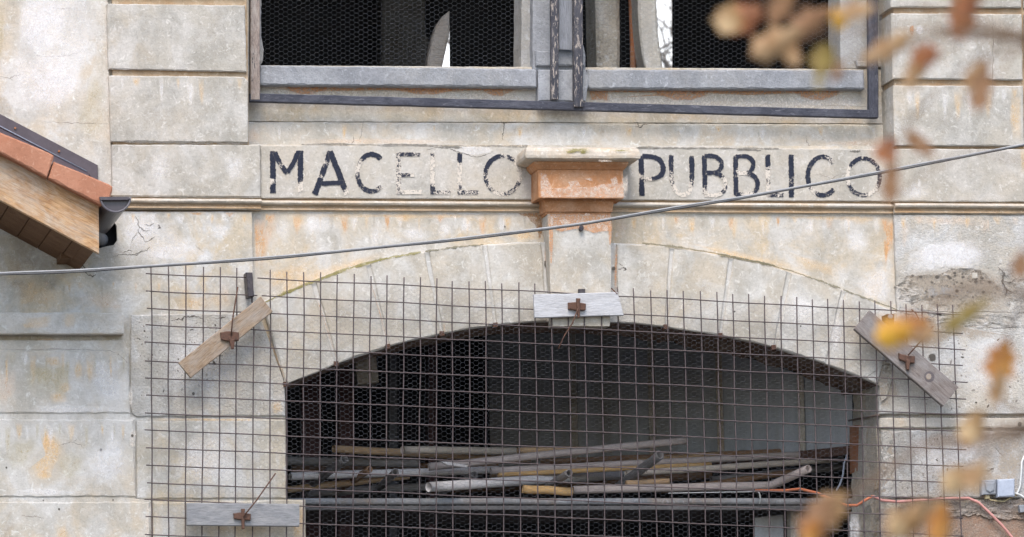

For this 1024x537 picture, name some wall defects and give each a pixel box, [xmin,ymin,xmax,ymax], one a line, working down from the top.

crack [117,216,161,256]
peeling [896,262,1024,364]